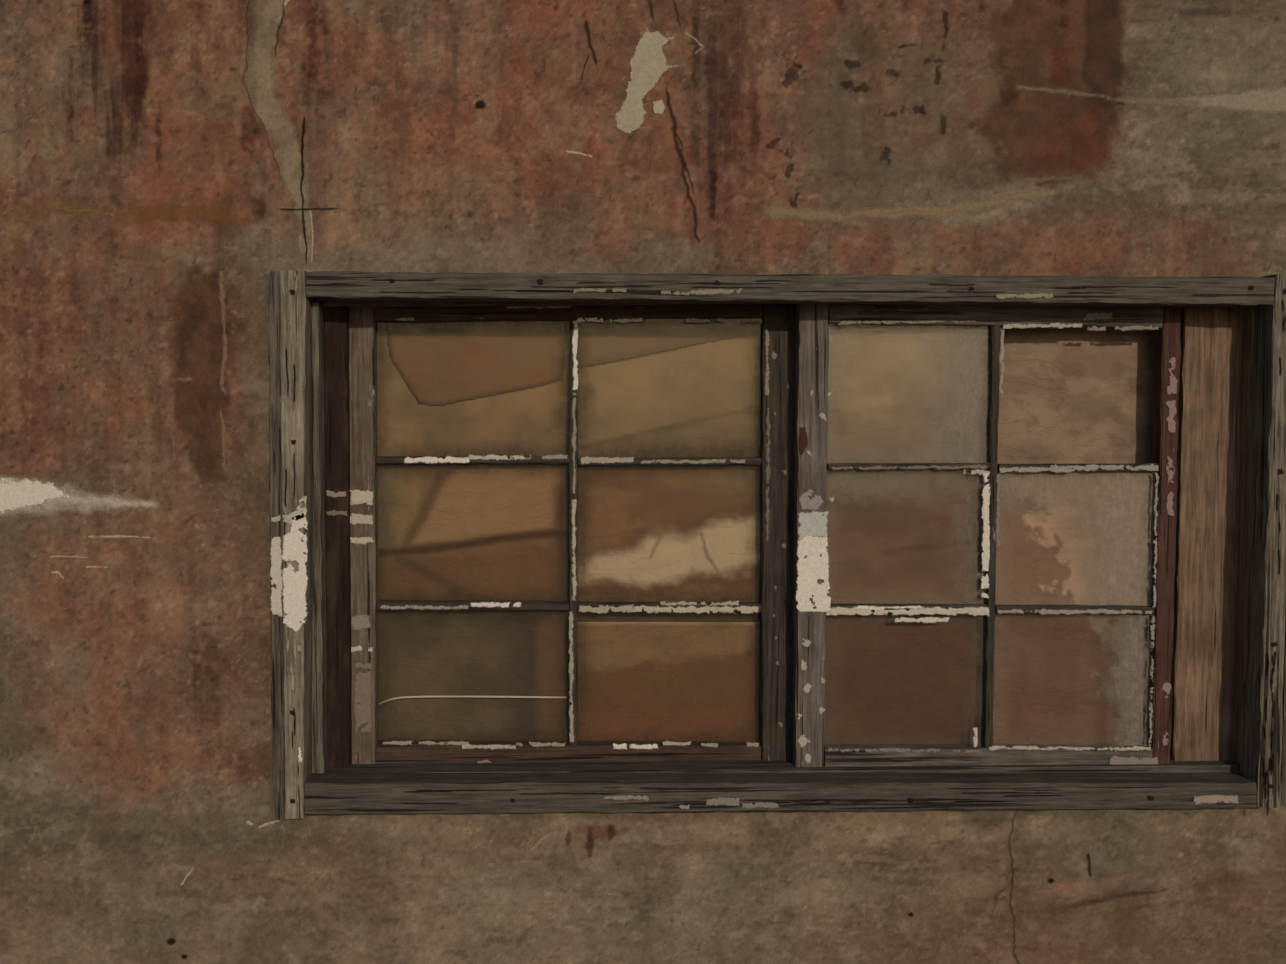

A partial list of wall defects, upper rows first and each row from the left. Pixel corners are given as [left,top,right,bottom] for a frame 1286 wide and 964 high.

crack [245,0,338,267]
crack [995,814,1020,964]